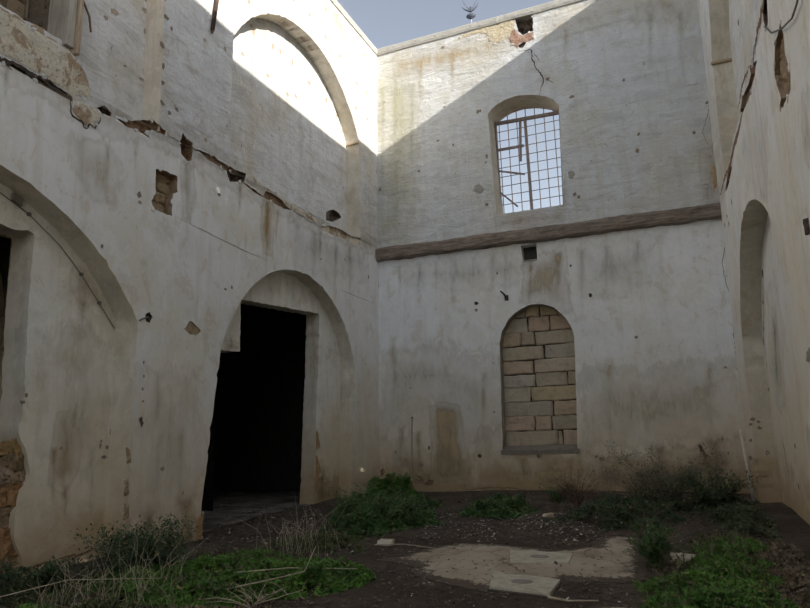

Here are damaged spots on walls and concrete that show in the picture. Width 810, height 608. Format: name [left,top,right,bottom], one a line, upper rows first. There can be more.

flaking render [0,9,166,138]
flaking render [458,15,535,48]
crack [522,49,553,93]
crack [702,0,764,195]
spalling [761,0,791,111]
spalling [137,167,178,216]
flaking render [178,134,362,246]
spalling [184,321,201,337]
leakage [436,408,462,475]
spalling [0,437,26,578]